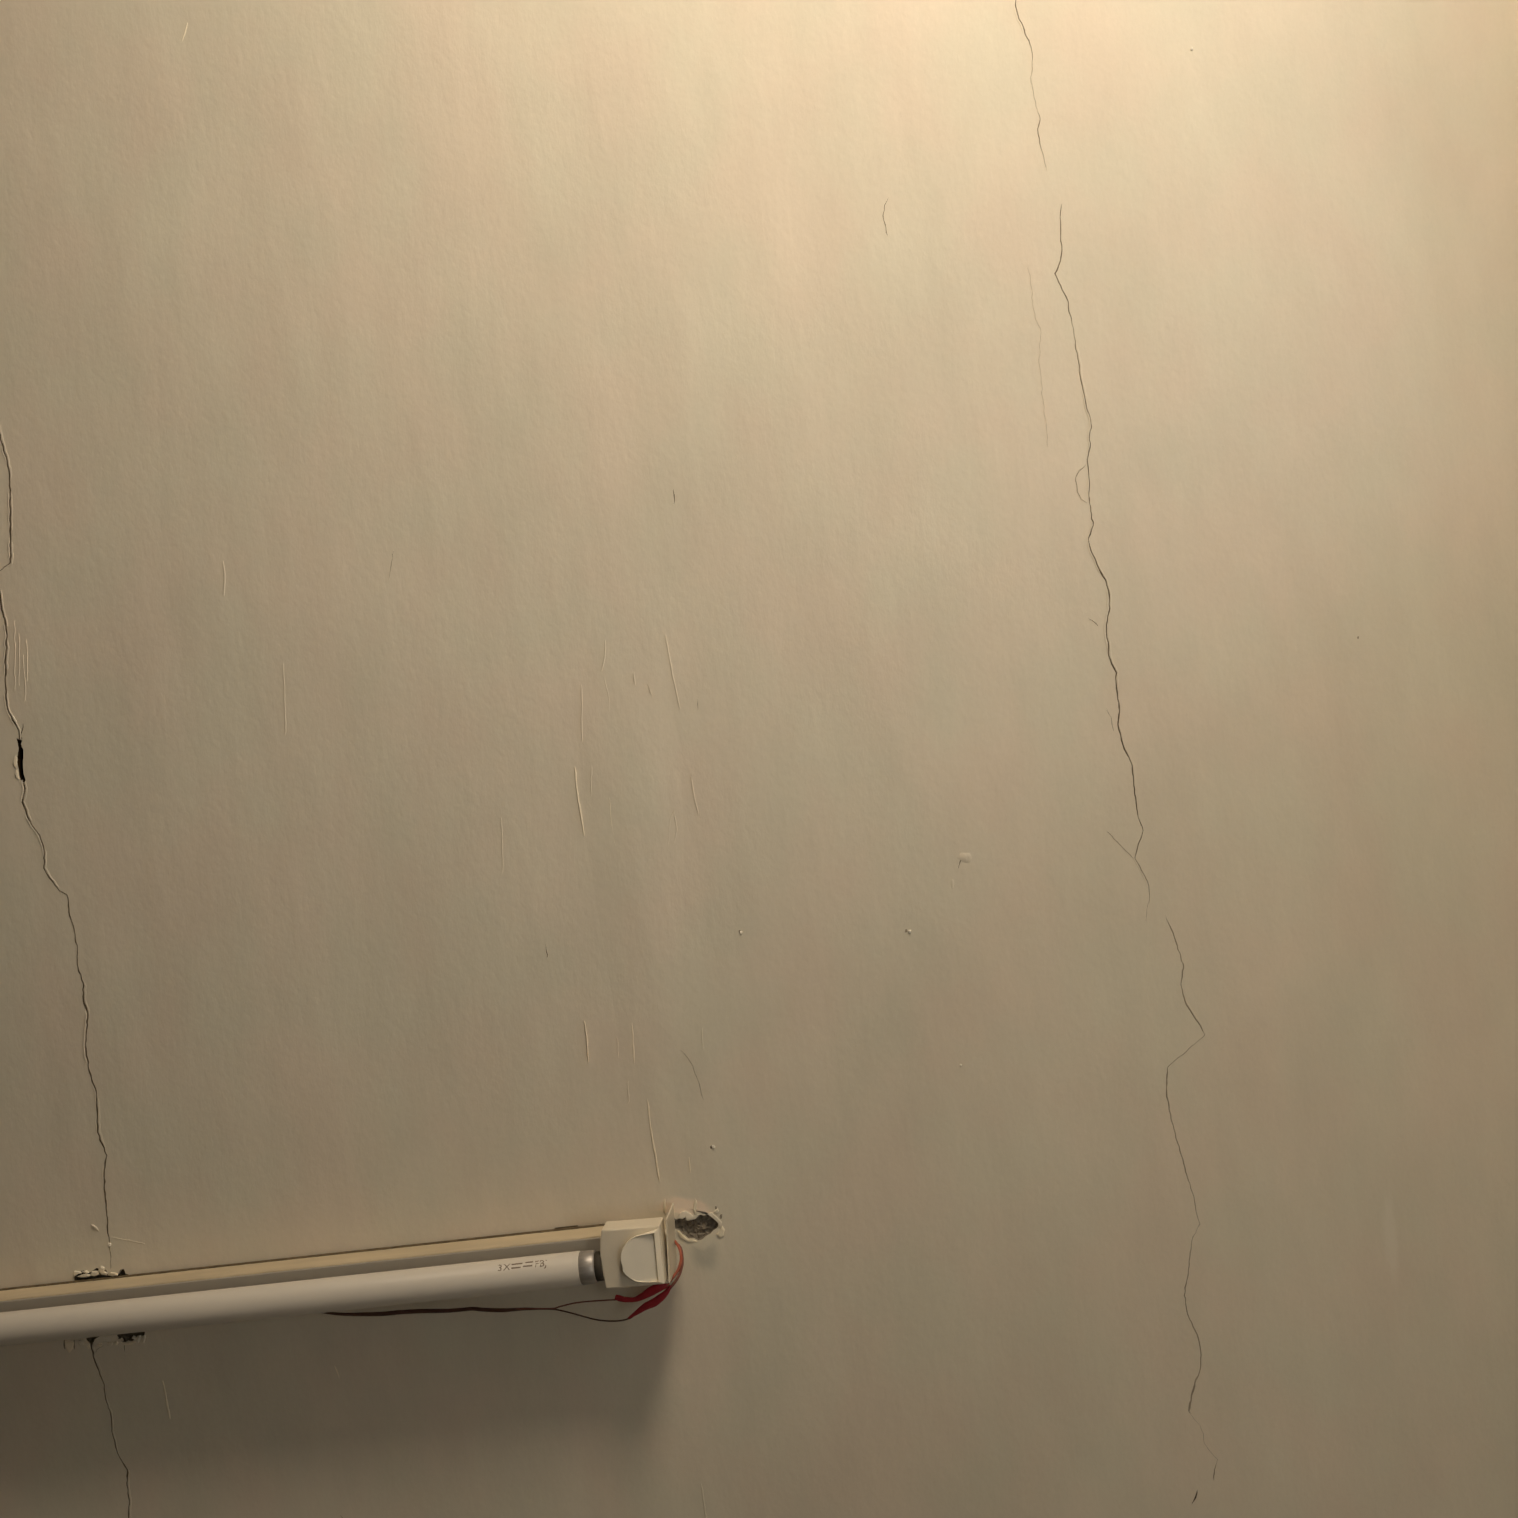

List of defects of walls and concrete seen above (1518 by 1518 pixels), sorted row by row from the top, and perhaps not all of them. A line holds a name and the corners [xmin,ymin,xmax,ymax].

crack [1015,0,1046,166]
crack [0,427,145,1264]
crack [1028,205,1218,1503]
flaking render [644,1192,725,1243]
crack [90,1341,132,1518]